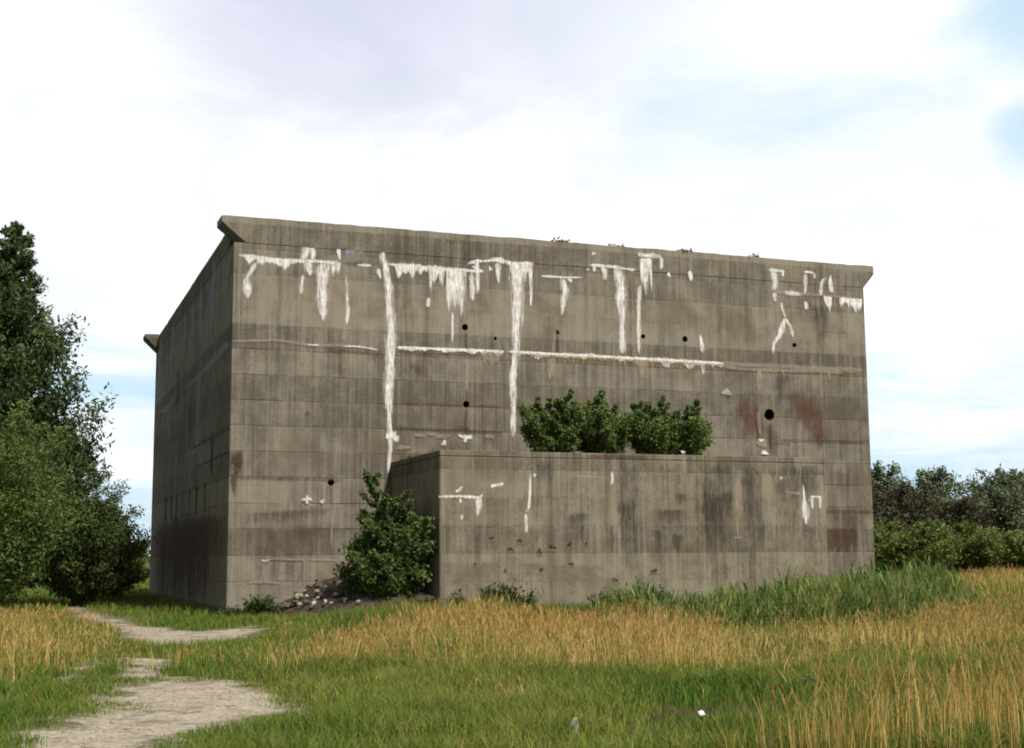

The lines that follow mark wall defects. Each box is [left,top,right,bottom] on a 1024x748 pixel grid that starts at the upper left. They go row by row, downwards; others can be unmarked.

water stain [157,245,862,471]
water stain [780,472,822,524]